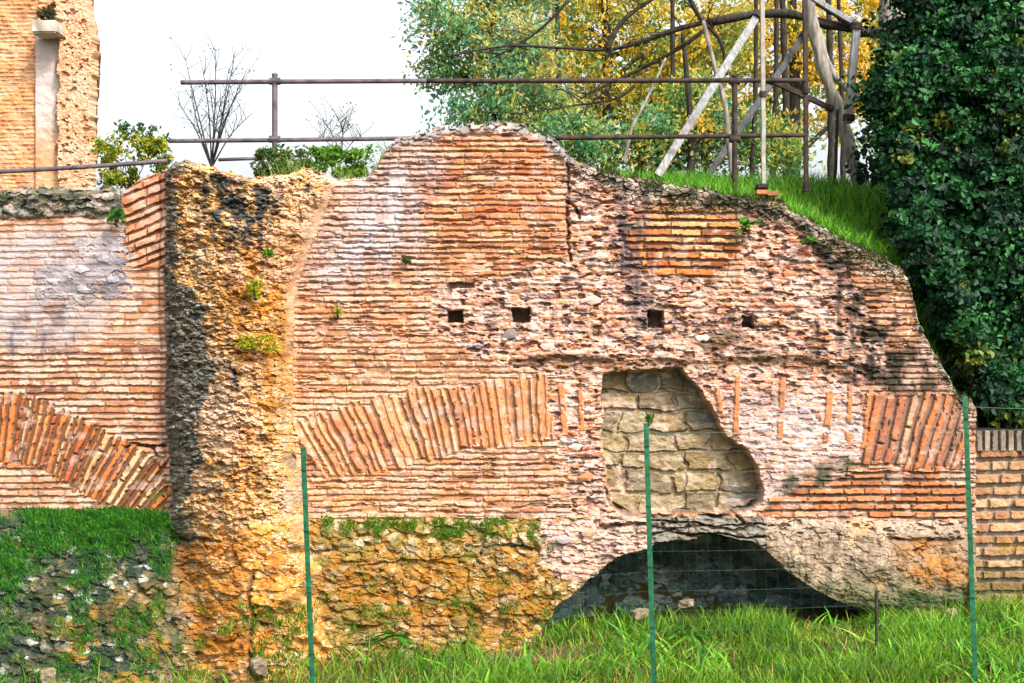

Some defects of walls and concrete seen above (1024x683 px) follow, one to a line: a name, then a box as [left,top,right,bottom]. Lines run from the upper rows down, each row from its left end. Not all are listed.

crack [565,154,581,262]
peeling [34,221,134,316]
spalling [426,171,890,585]